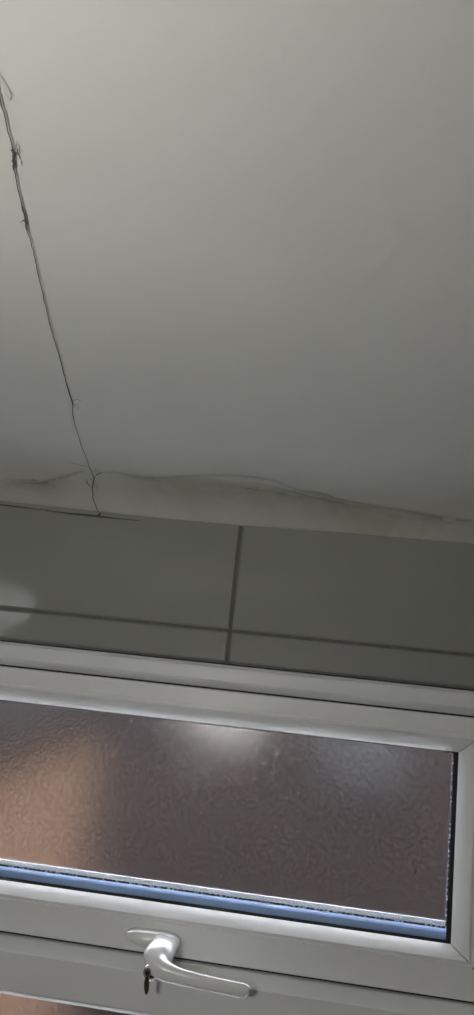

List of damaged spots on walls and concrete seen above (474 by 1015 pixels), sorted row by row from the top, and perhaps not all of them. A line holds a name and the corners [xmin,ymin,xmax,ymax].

crack [0,75,140,521]